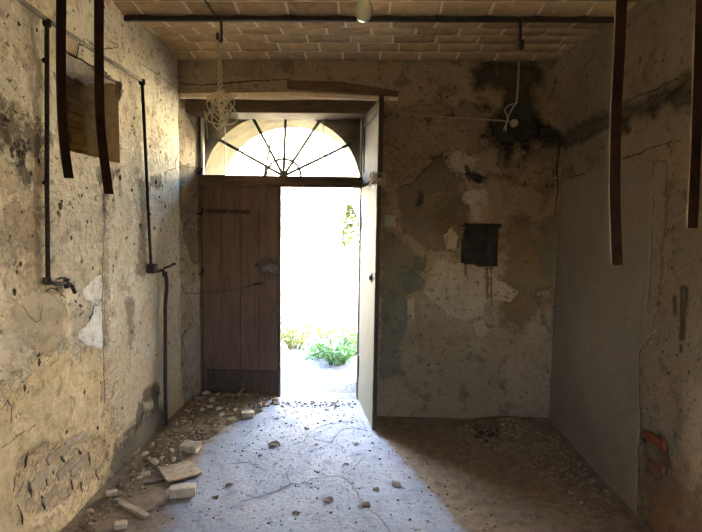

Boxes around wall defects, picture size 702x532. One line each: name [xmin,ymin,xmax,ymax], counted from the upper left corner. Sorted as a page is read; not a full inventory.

water stain [0,97,53,185]
crack [144,65,292,109]
water stain [470,61,610,165]
flaking render [378,151,518,379]
flaking render [0,267,127,532]
crack [242,454,390,532]
crack [292,418,367,451]
spalling [640,429,672,480]